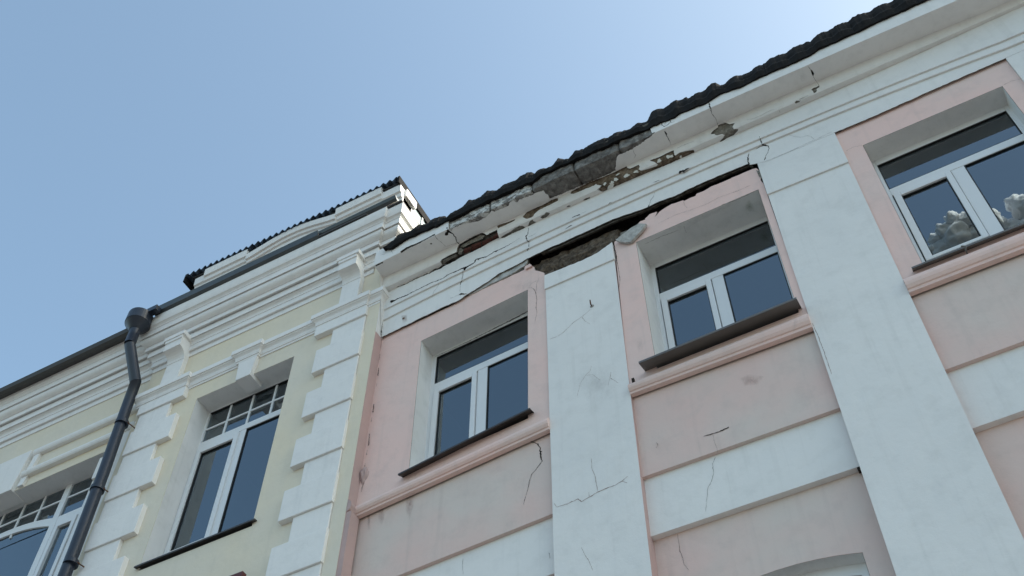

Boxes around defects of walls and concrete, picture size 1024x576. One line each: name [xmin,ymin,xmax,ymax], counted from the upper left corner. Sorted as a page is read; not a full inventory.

flaking render [712,123,738,141]
spalling [433,150,764,295]
crack [648,136,820,243]
crack [554,459,628,507]